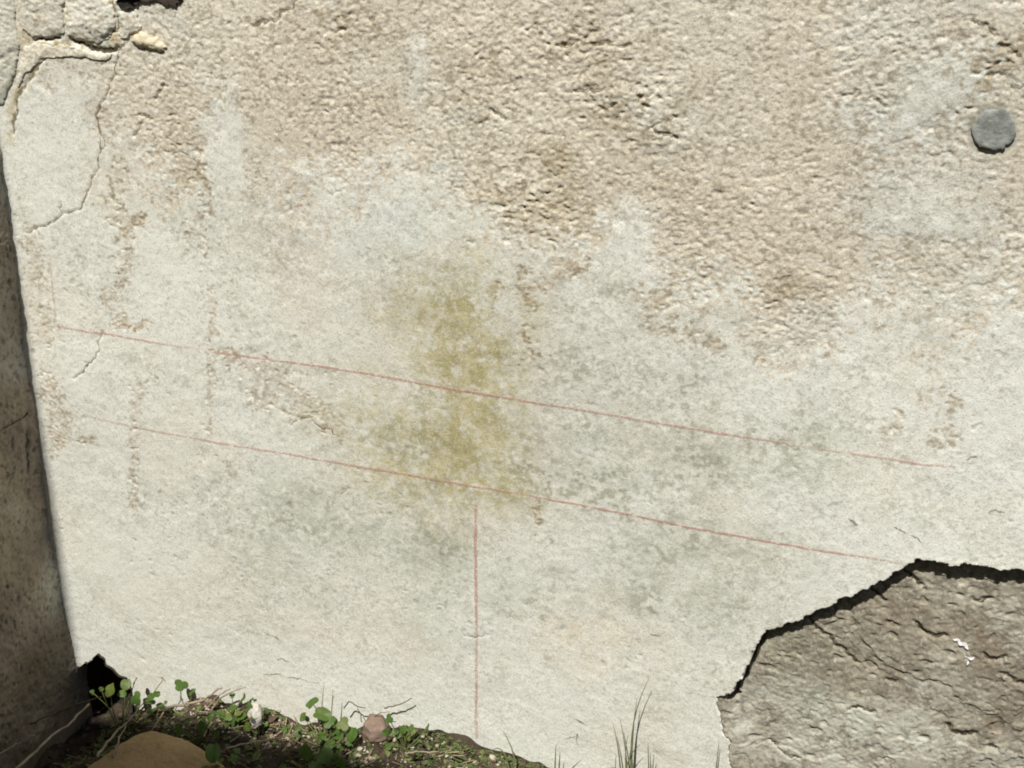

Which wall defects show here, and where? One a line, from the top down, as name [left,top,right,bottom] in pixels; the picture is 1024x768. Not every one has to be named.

crack [11,0,131,233]
water stain [192,79,902,696]
spalling [716,559,1024,768]